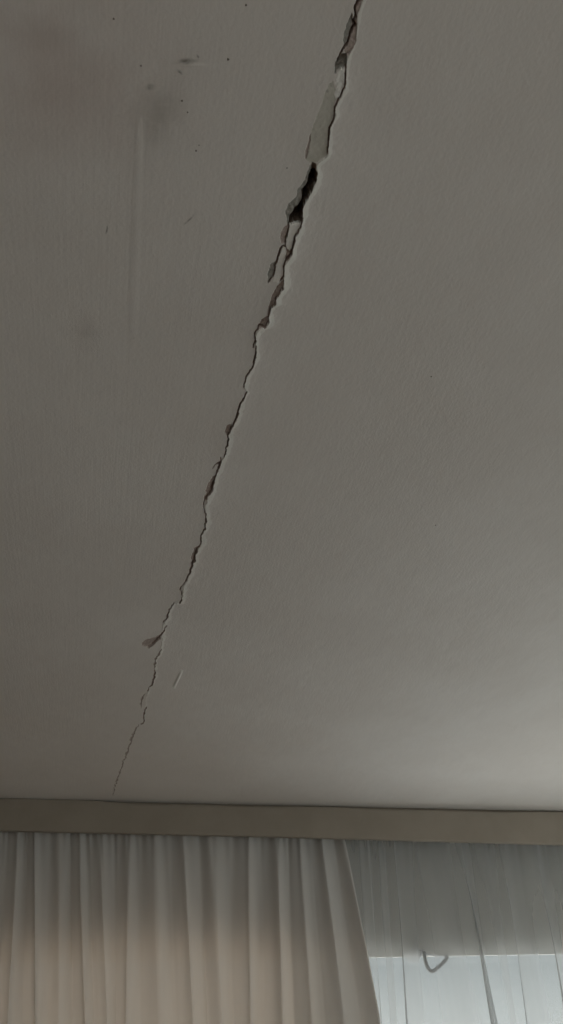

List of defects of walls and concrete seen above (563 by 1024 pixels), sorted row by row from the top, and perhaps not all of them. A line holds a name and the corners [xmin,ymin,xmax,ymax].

crack [113,0,367,794]
peeling [259,0,363,329]